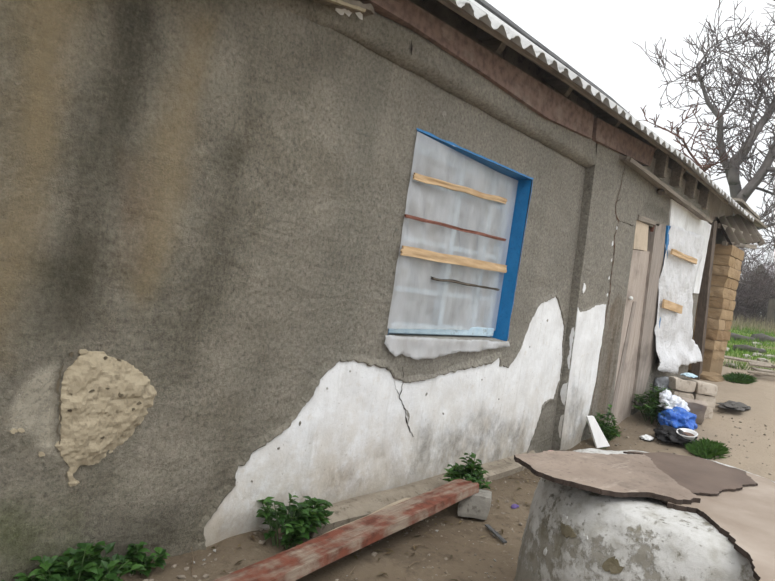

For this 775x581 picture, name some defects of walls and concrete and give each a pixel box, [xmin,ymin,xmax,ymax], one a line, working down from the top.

peeling [193,292,607,564]
crack [394,367,414,437]
crack [591,168,635,411]